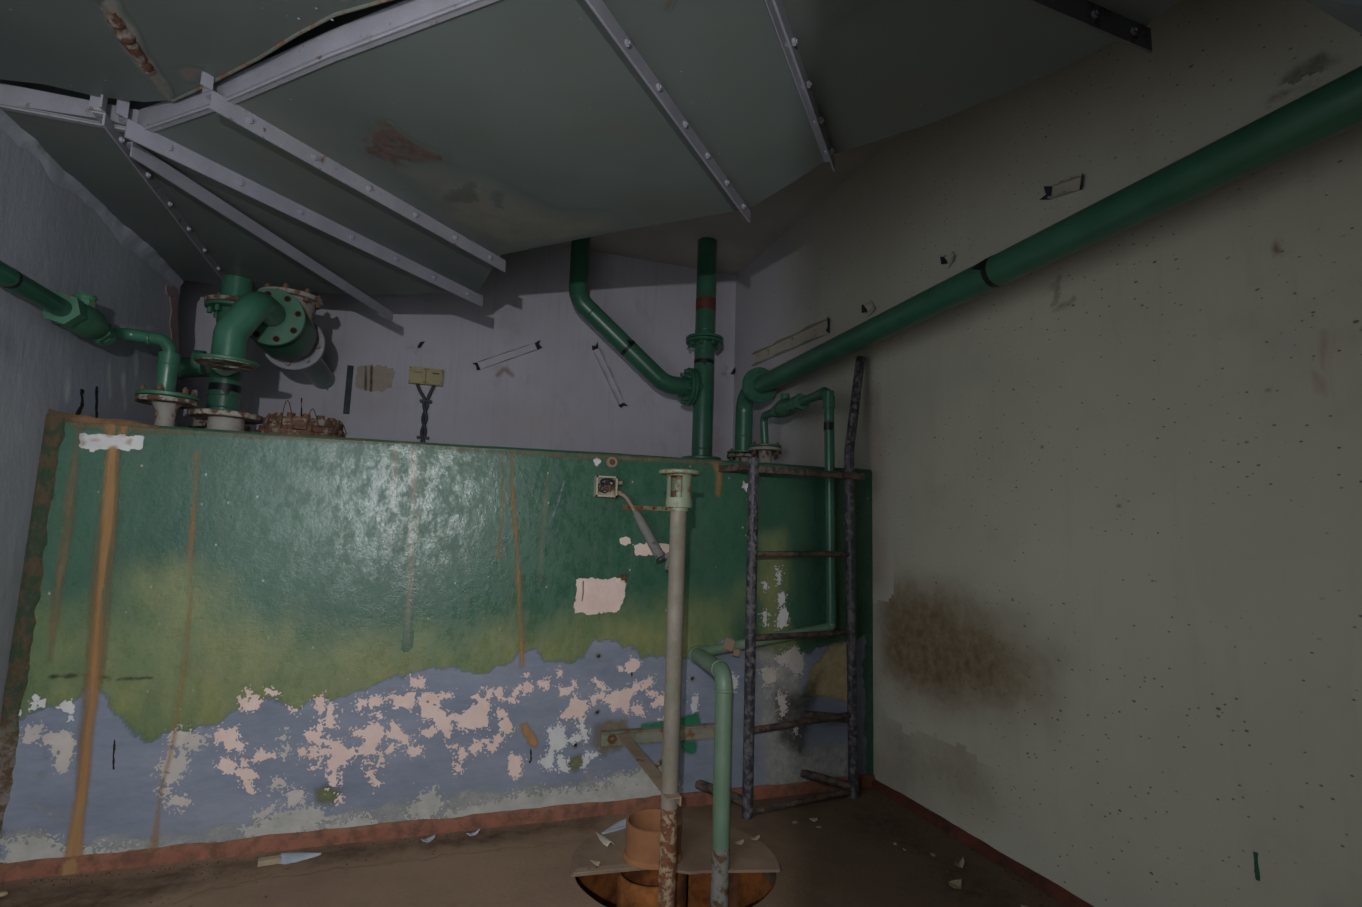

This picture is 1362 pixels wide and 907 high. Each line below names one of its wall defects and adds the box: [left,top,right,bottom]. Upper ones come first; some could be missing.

corrosion [61,424,126,876]
peeling [0,640,666,864]
peeling [574,575,627,615]
peeling [679,658,715,793]
peeling [714,565,867,788]
damp [859,373,1097,843]